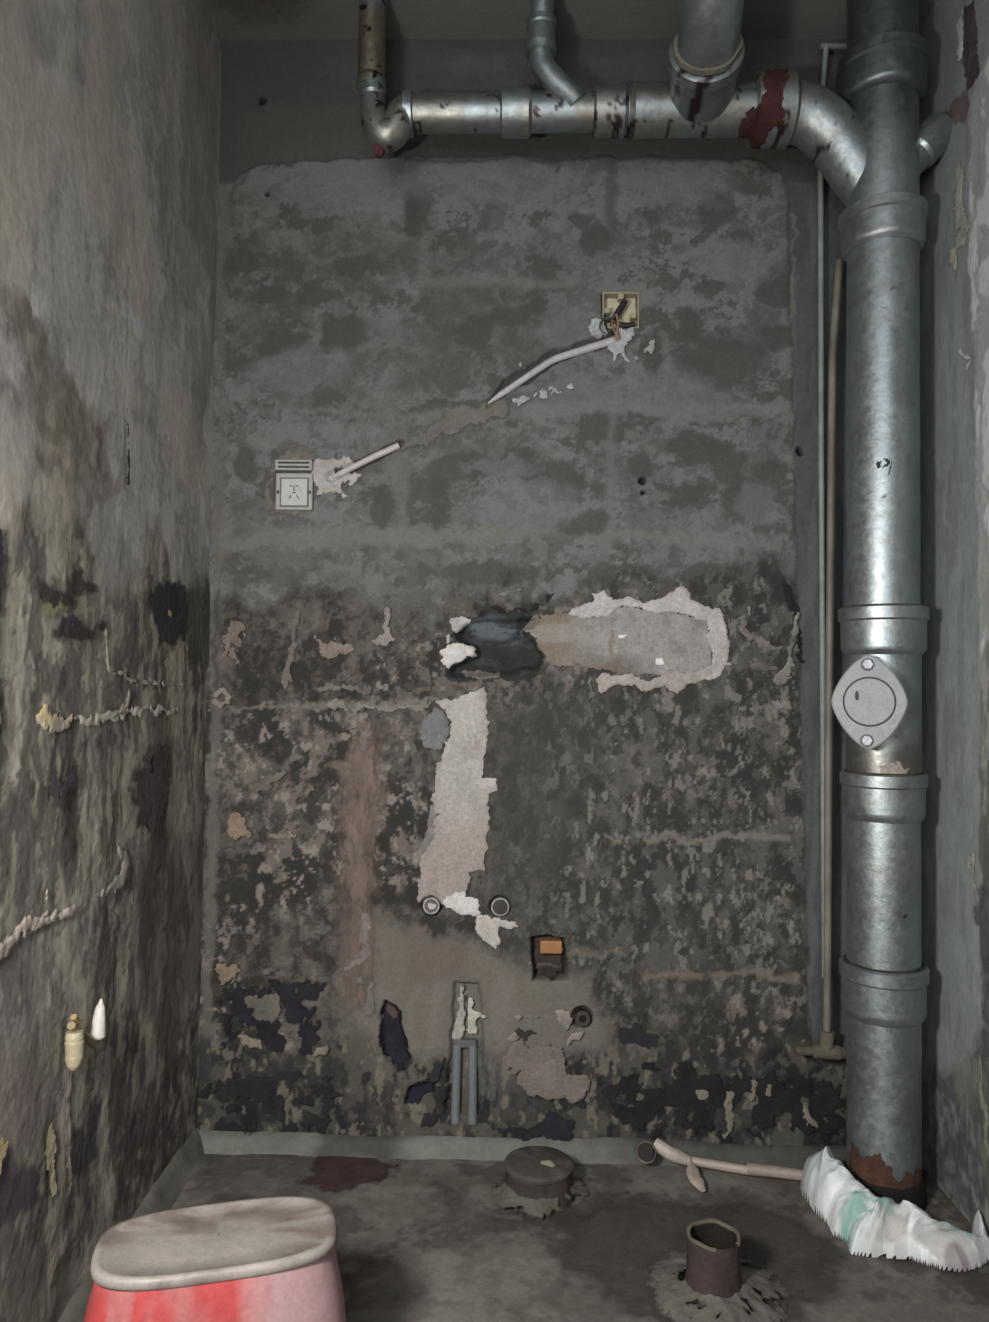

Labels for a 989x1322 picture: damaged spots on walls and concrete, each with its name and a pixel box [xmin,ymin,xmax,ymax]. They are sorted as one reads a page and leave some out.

corrosion [738,68,790,150]
flaking render [948,163,971,277]
flaking render [223,620,248,664]
flaking render [281,611,300,689]
flaking render [313,580,805,949]
spalling [529,934,564,981]
flaking render [452,984,590,1108]
damp [601,1022,847,1147]
damp [493,1112,574,1142]
corrosion [849,1143,923,1190]